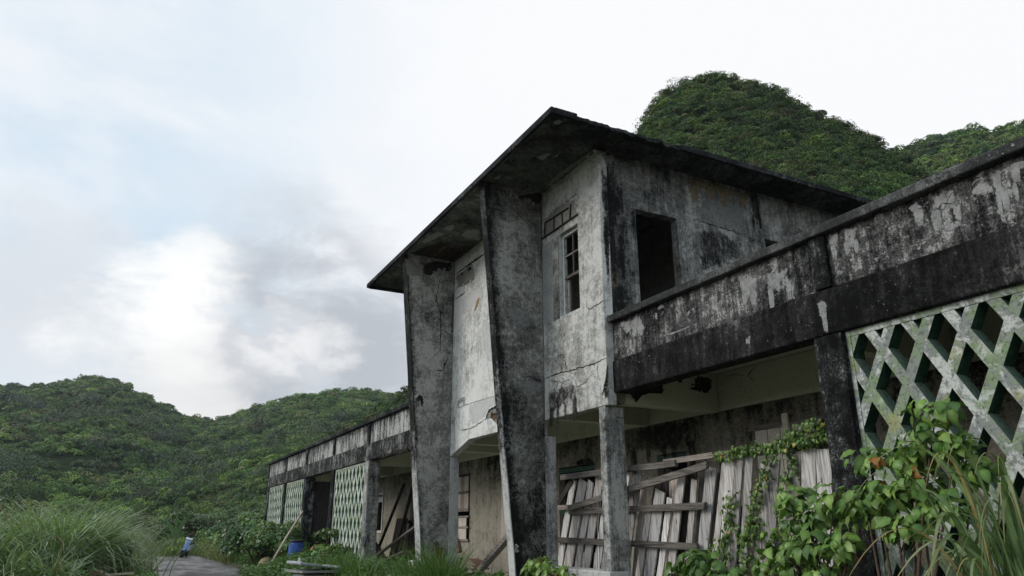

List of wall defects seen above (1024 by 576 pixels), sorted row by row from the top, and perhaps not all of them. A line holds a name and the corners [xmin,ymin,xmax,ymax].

damp [601,153,625,285]
damp [687,178,762,230]
peeling [909,190,962,232]
peeling [992,161,1024,213]
damp [700,229,740,269]
crack [426,254,484,371]
efflorescence [817,302,828,332]
crack [527,358,606,386]
peeling [469,396,497,424]